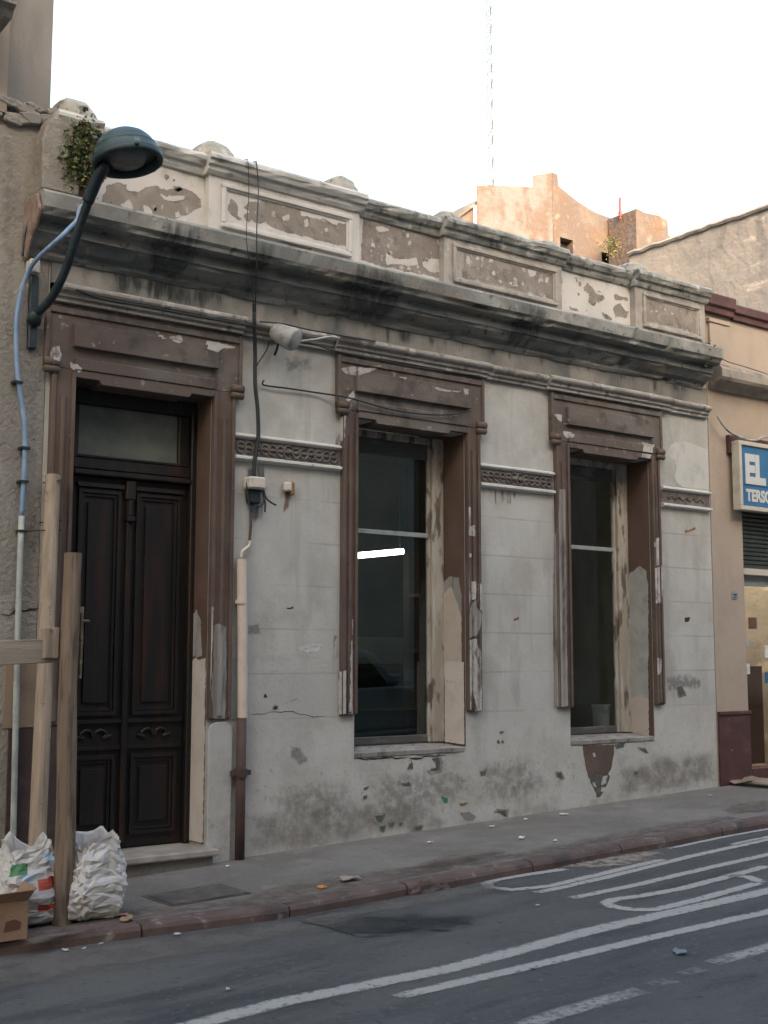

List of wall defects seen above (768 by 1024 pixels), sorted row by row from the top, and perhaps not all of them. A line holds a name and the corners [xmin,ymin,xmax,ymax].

peeling [101,174,201,219]
leakage [119,223,195,302]
peeling [228,199,346,251]
leakage [345,268,410,341]
peeling [361,218,439,278]
peeling [462,253,629,320]
peeling [444,576,482,744]
peeling [614,538,663,753]
spalling [675,683,686,698]
peeling [189,607,227,843]
spalling [427,754,443,775]
spalling [373,813,424,833]